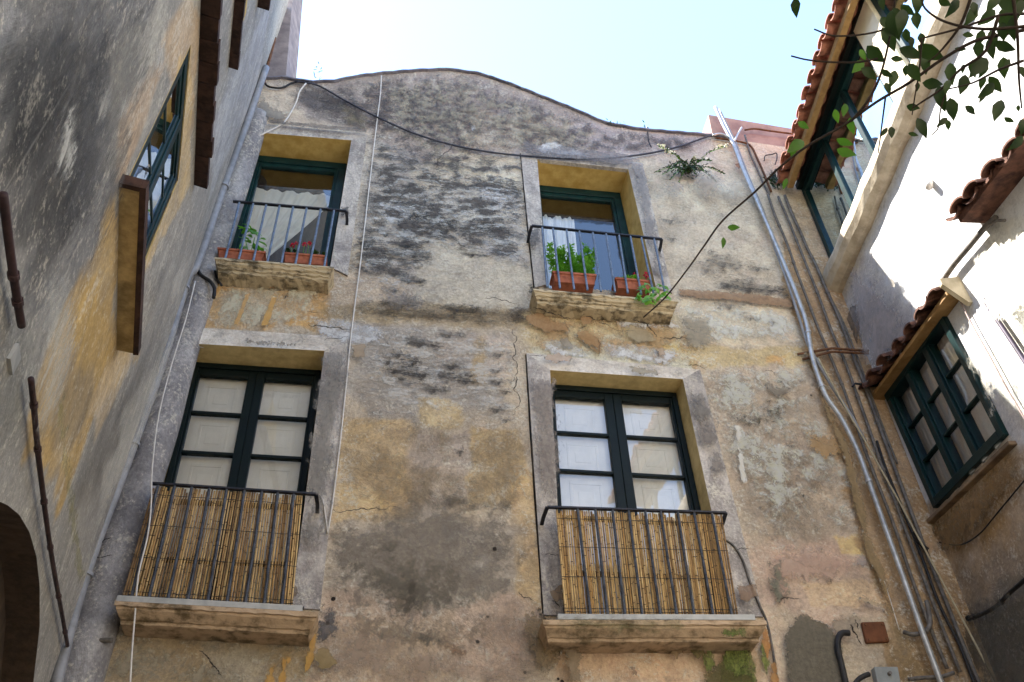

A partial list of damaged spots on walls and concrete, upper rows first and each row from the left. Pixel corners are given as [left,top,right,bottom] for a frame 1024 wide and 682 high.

leakage [269,120,525,318]
leakage [538,142,578,153]
leakage [381,330,475,395]
peeling [526,312,700,376]
leakage [301,352,510,623]
crack [512,329,560,614]
peeling [714,366,848,515]